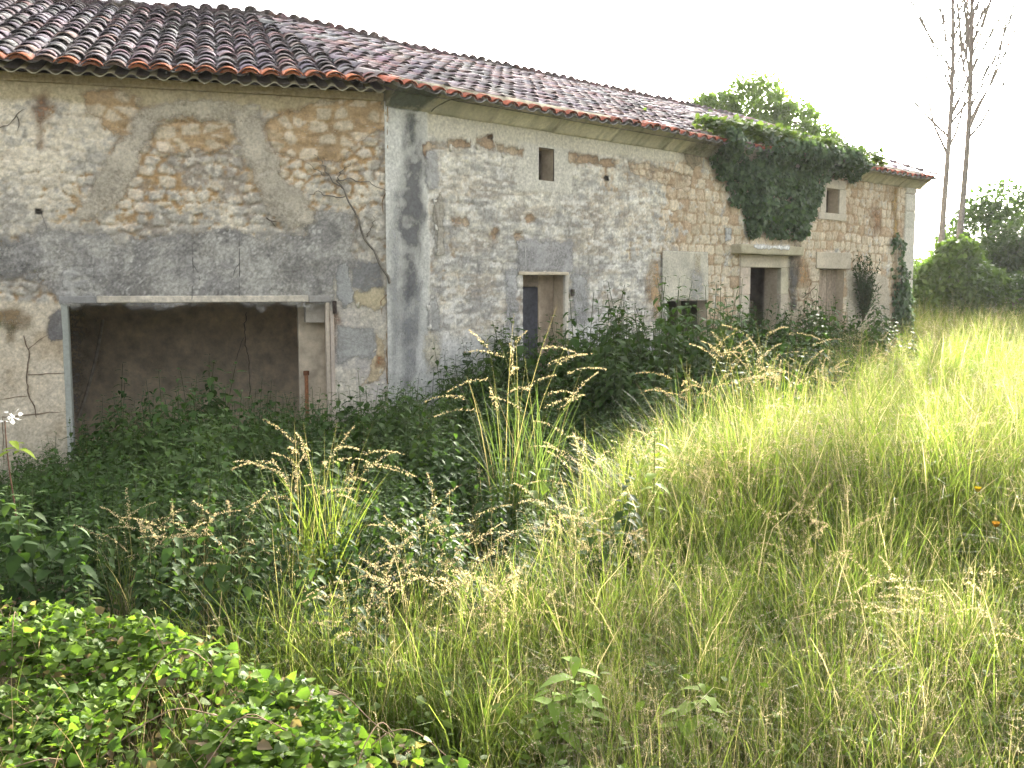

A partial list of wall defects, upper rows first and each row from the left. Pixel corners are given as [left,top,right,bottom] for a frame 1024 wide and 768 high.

spalling [147,115,238,154]
spalling [264,90,388,162]
spalling [628,153,701,192]
water stain [352,115,427,386]